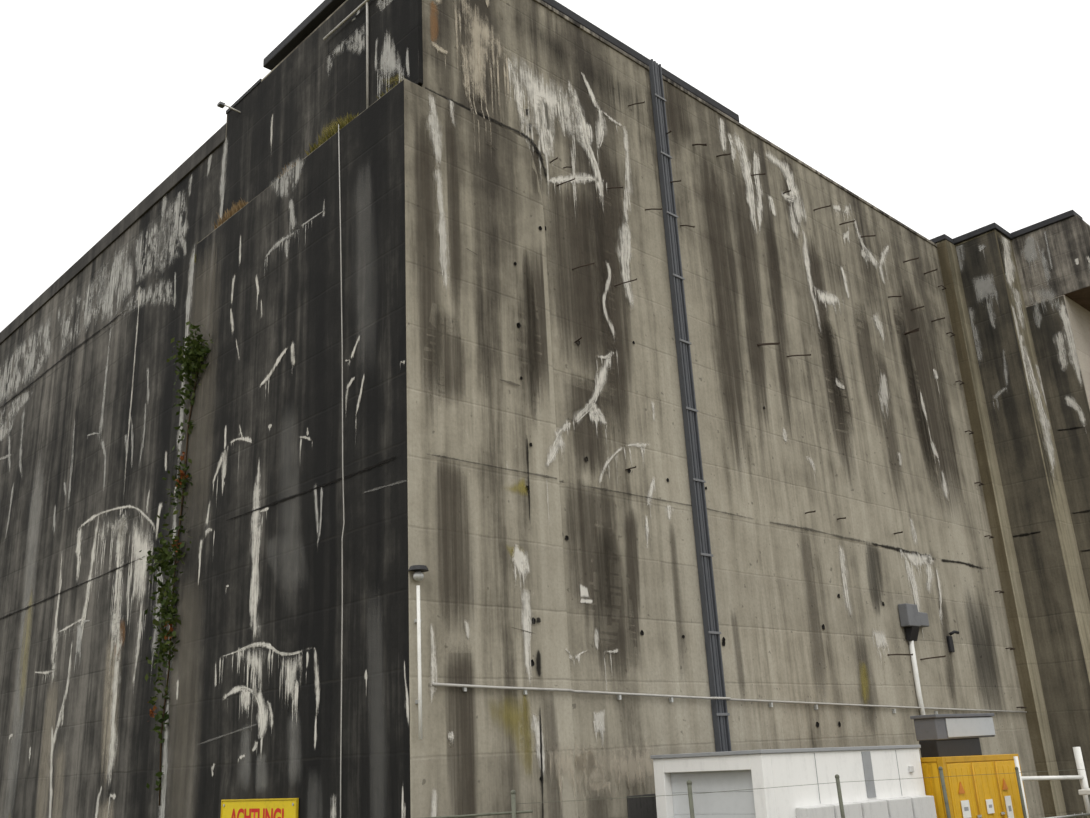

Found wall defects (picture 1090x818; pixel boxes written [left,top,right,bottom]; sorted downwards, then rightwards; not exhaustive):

leakage [327,10,409,98]
leakage [173,237,195,356]
leakage [266,160,324,260]
leakage [417,97,461,391]
leakage [432,0,633,467]
leakage [704,119,851,470]
efflorescence [213,427,251,493]
leakage [20,476,178,818]
leakage [215,462,320,761]
leakage [431,626,475,818]
efflorescence [512,547,531,678]
leakage [578,479,655,674]